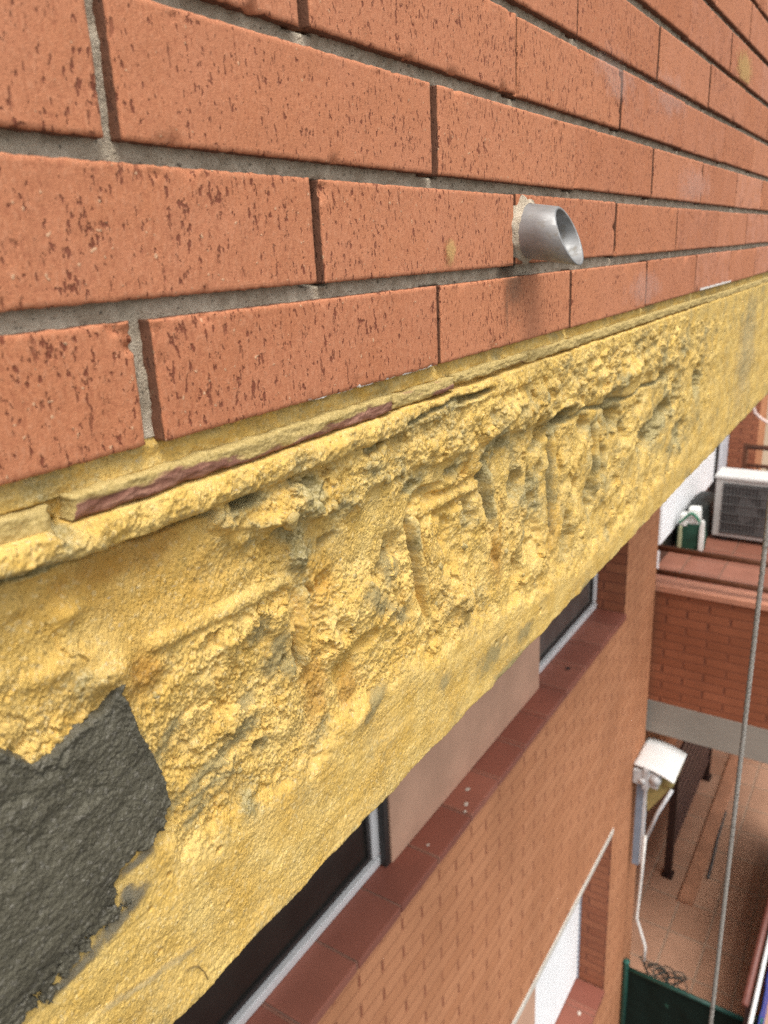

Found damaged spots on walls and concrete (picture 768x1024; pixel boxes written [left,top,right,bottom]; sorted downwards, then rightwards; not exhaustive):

spalling [119,322,706,848]